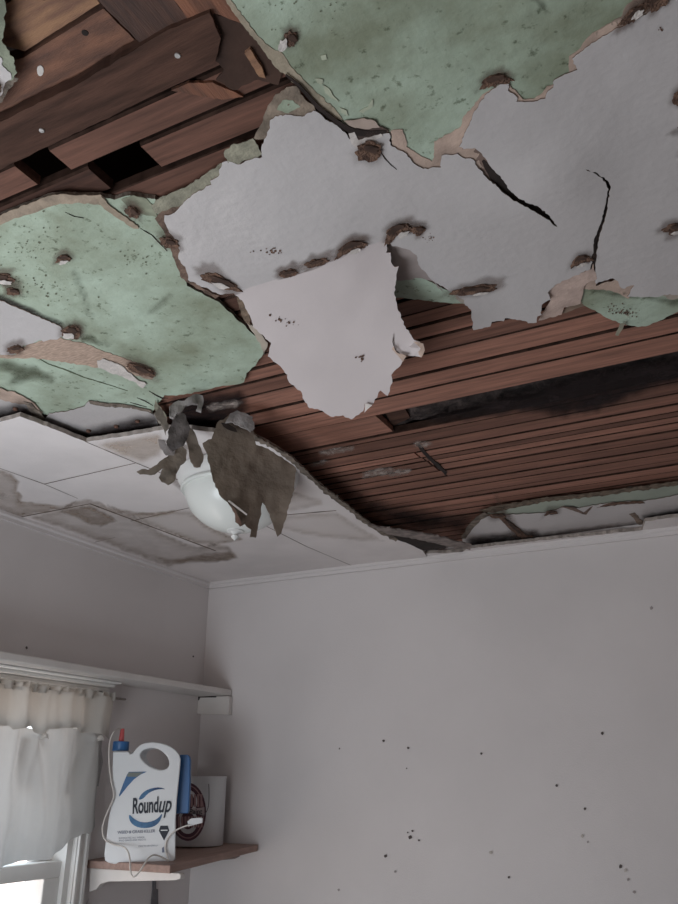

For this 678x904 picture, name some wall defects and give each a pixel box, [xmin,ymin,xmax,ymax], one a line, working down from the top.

crack [285,74,397,170]
peeling [0,0,678,432]
crack [482,160,557,226]
crack [588,170,610,270]
leakage [433,358,678,421]
peeling [461,481,678,543]